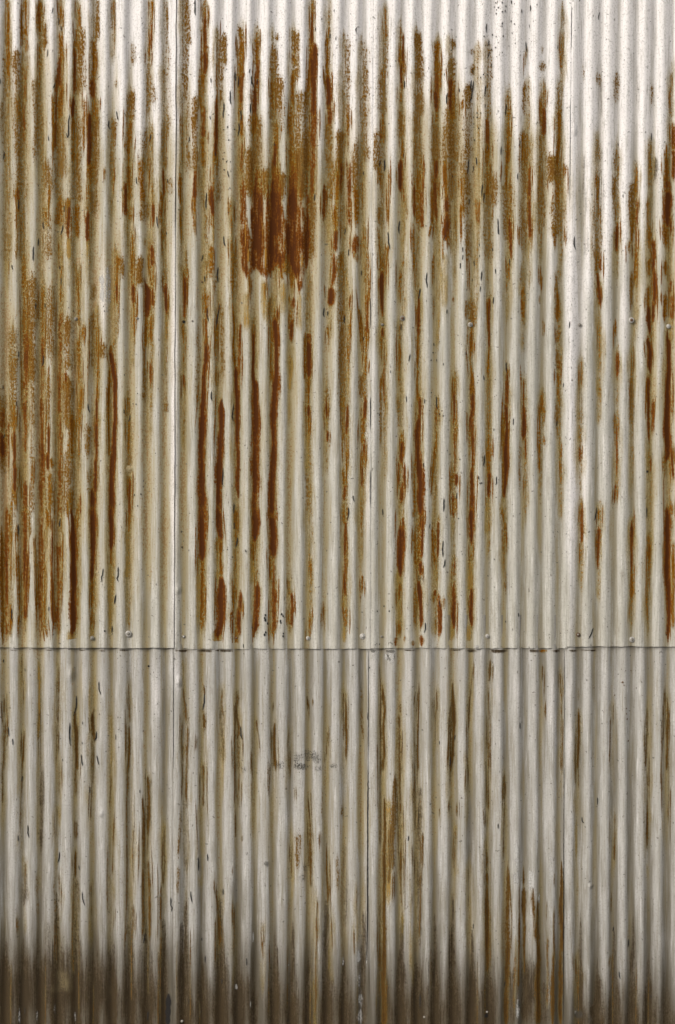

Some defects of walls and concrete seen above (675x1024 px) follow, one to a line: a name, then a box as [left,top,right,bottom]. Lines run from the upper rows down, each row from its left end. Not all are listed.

rust [0,0,569,647]
rust [578,62,675,642]
water stain [0,861,563,1024]
water stain [576,923,675,1024]